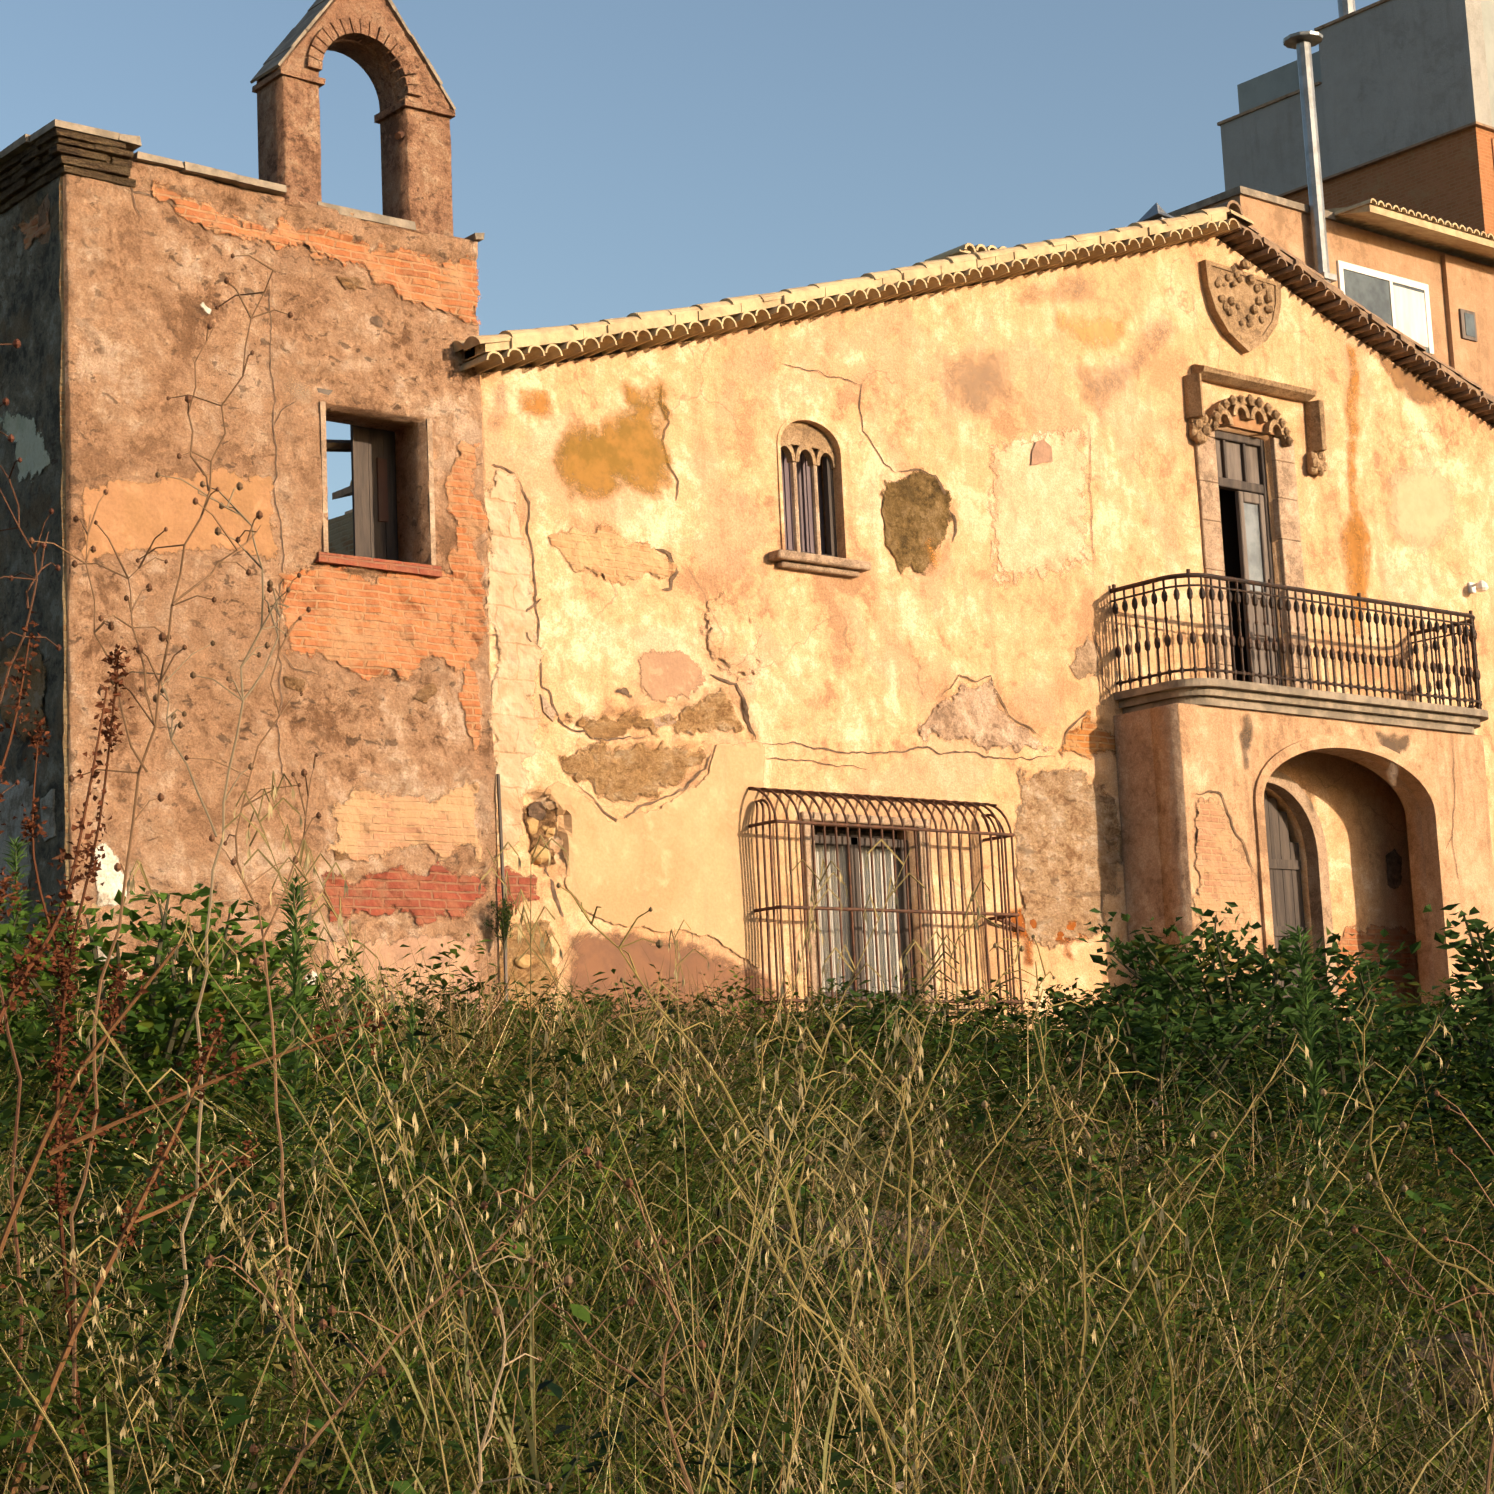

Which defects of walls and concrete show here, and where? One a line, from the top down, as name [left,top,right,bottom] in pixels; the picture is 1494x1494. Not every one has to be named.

peeling [0,411,51,482]
crack [780,362,893,471]
spalling [880,468,957,576]
spalling [278,440,756,1017]
crack [763,741,1045,770]
peeling [0,778,56,943]
spalling [918,674,1122,950]
spalling [1193,790,1256,1002]
water stain [570,933,777,1039]